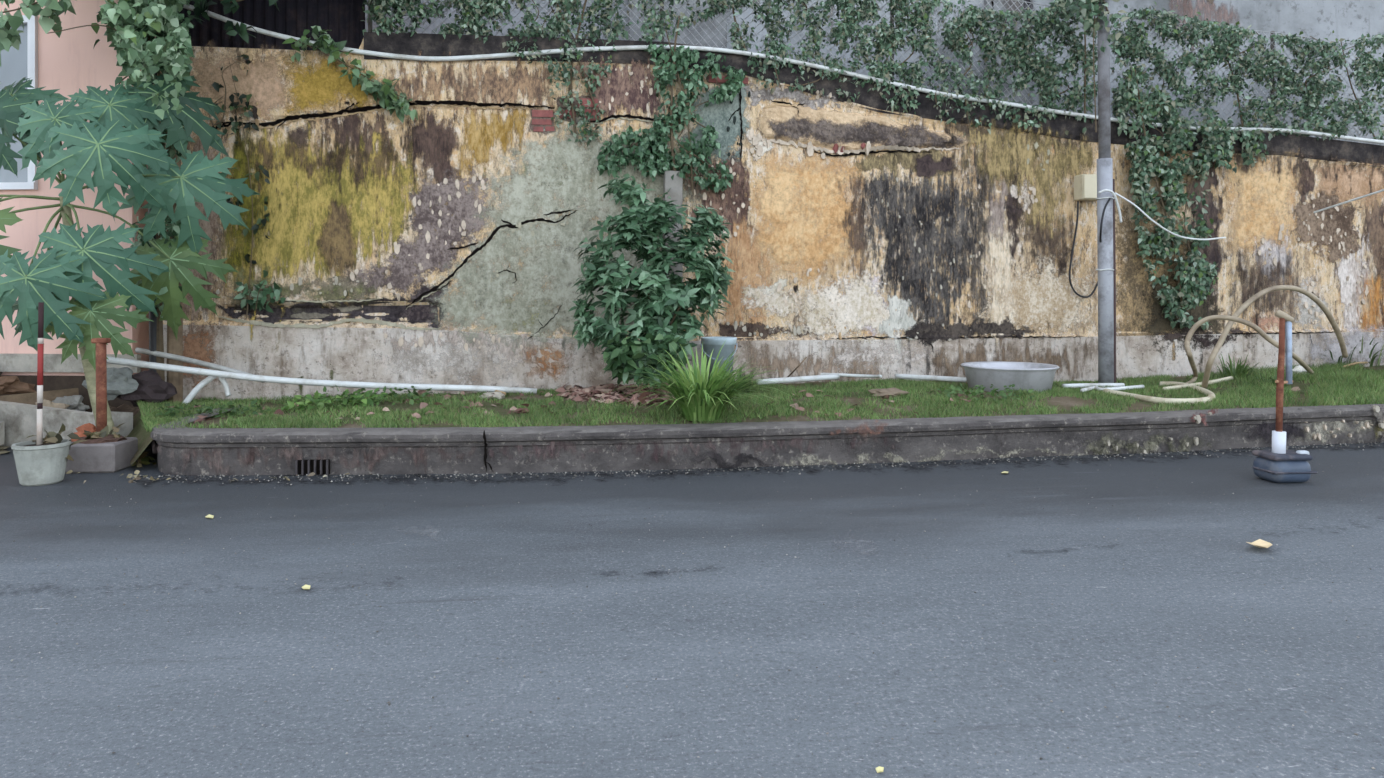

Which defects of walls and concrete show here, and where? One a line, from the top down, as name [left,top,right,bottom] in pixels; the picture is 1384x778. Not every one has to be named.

crack [215,100,555,131]
crack [588,114,669,148]
leakage [183,47,554,340]
crack [278,210,577,308]
leakage [715,119,1098,384]